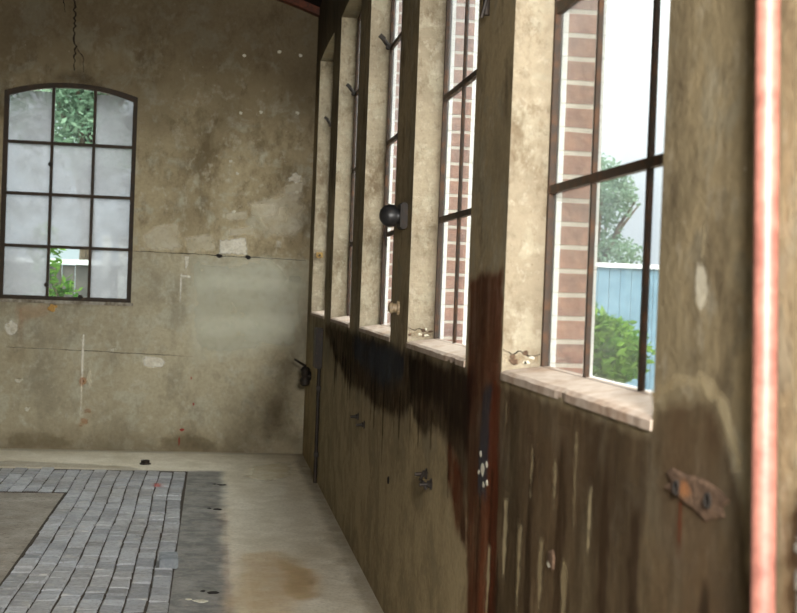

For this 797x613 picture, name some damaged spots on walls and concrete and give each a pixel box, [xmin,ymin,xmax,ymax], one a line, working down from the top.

crack [63,0,84,71]